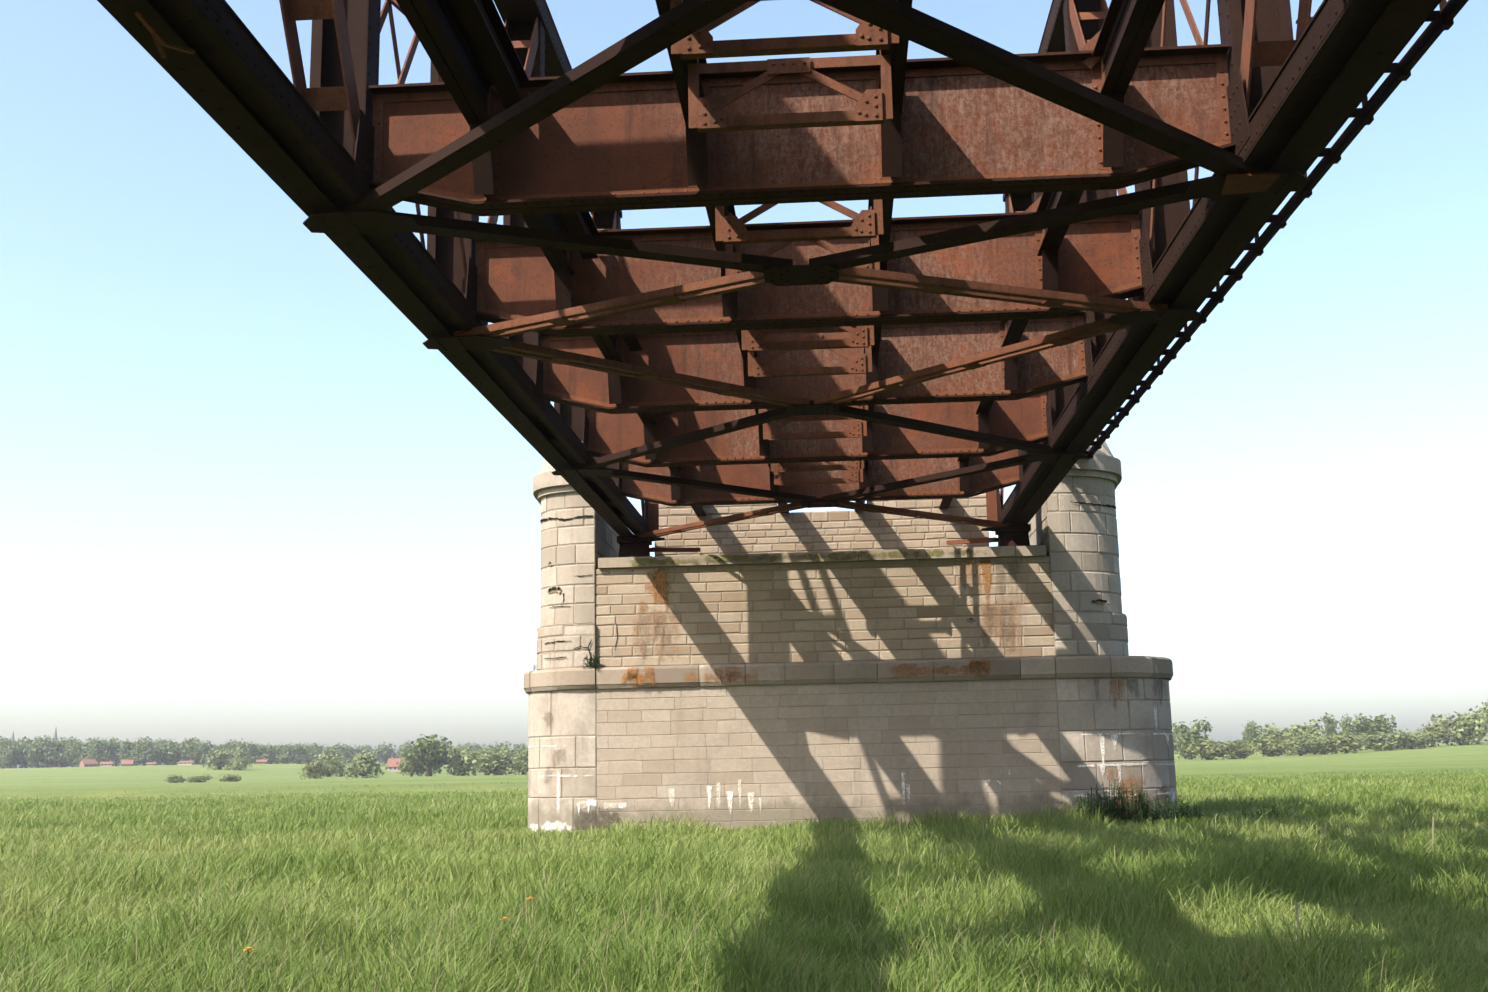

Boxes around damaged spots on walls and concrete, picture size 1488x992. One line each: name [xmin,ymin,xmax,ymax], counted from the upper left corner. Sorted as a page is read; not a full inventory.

crack [540,514,593,522]
rust [1107,768,1170,807]